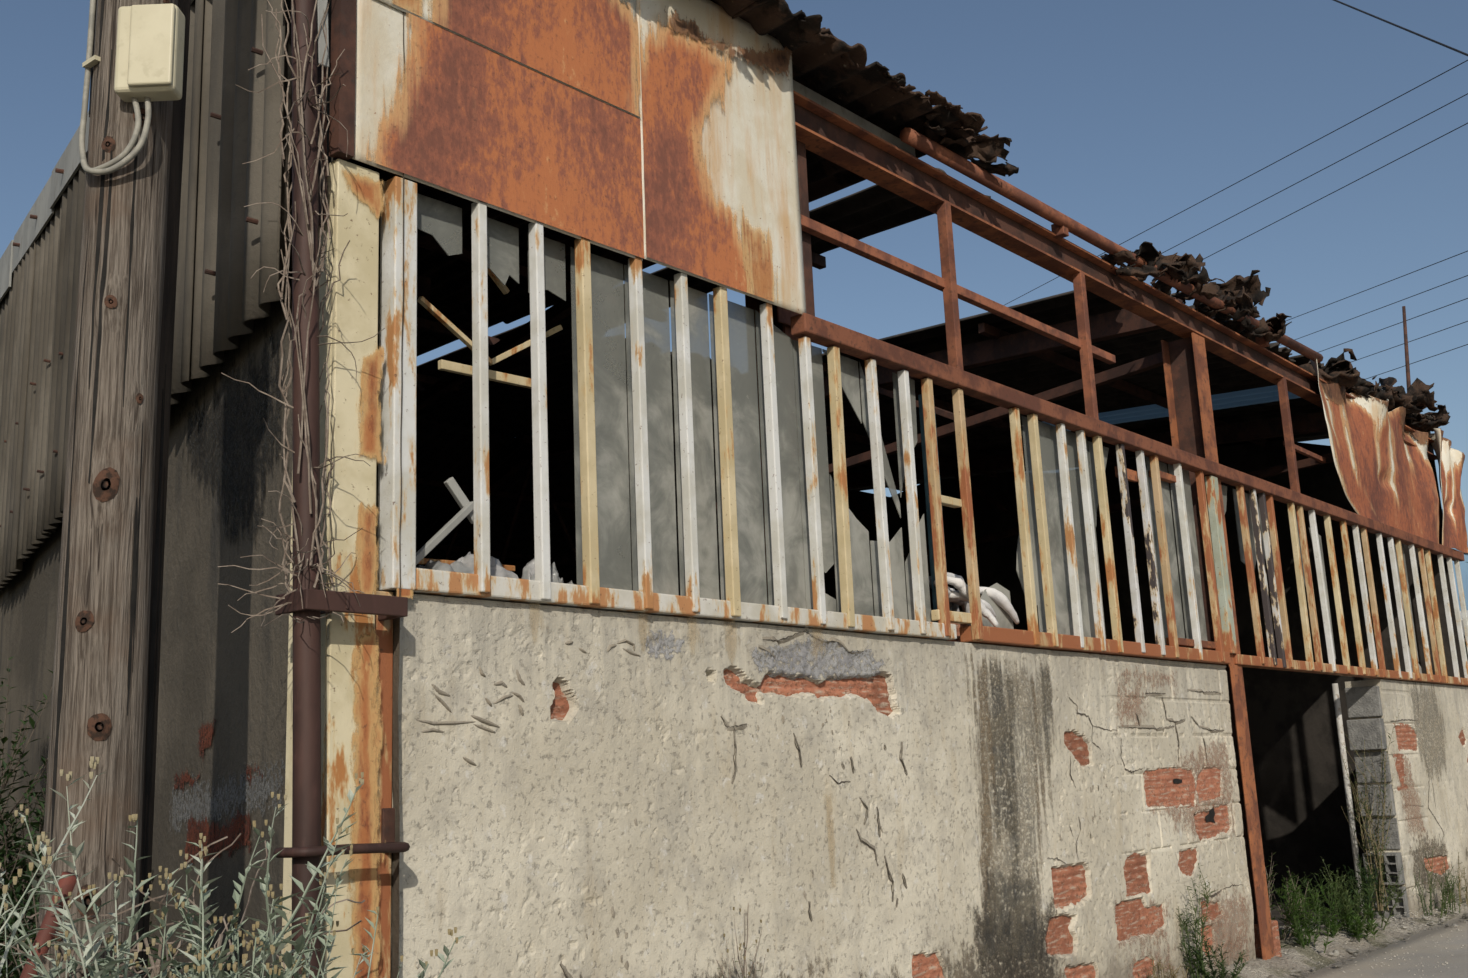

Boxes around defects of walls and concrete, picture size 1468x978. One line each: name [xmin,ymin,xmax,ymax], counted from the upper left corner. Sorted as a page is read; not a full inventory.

corrosion [342,0,793,302]
corrosion [359,347,387,465]
corrosion [1317,358,1468,553]
corrosion [356,502,378,595]
flaking render [550,682,569,720]
flaking render [723,634,893,750]
corrosion [349,627,385,978]
water stain [940,653,1065,978]
crack [1047,689,1224,864]
flaking render [1143,742,1234,876]
flaking render [1045,864,1096,978]
flaking render [1115,853,1171,978]